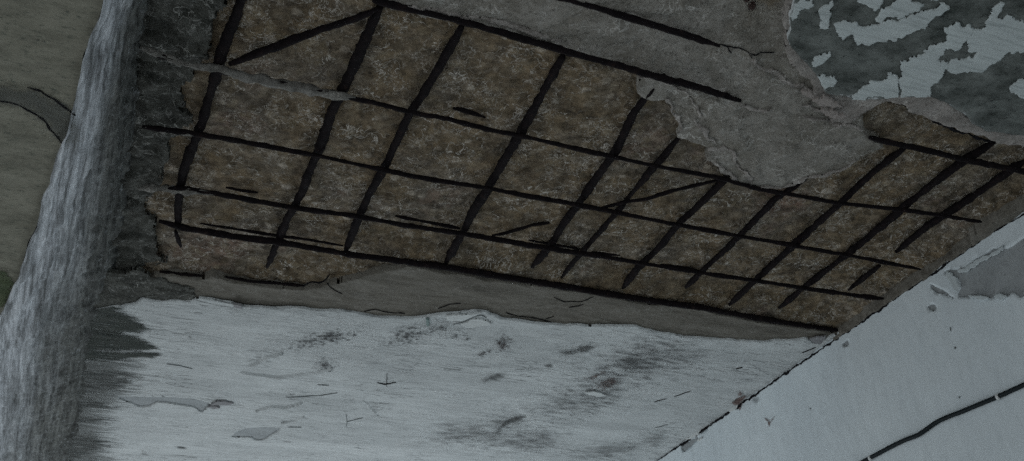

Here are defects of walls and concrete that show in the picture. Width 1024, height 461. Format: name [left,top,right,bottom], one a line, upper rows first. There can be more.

spalling [93,0,1024,347]